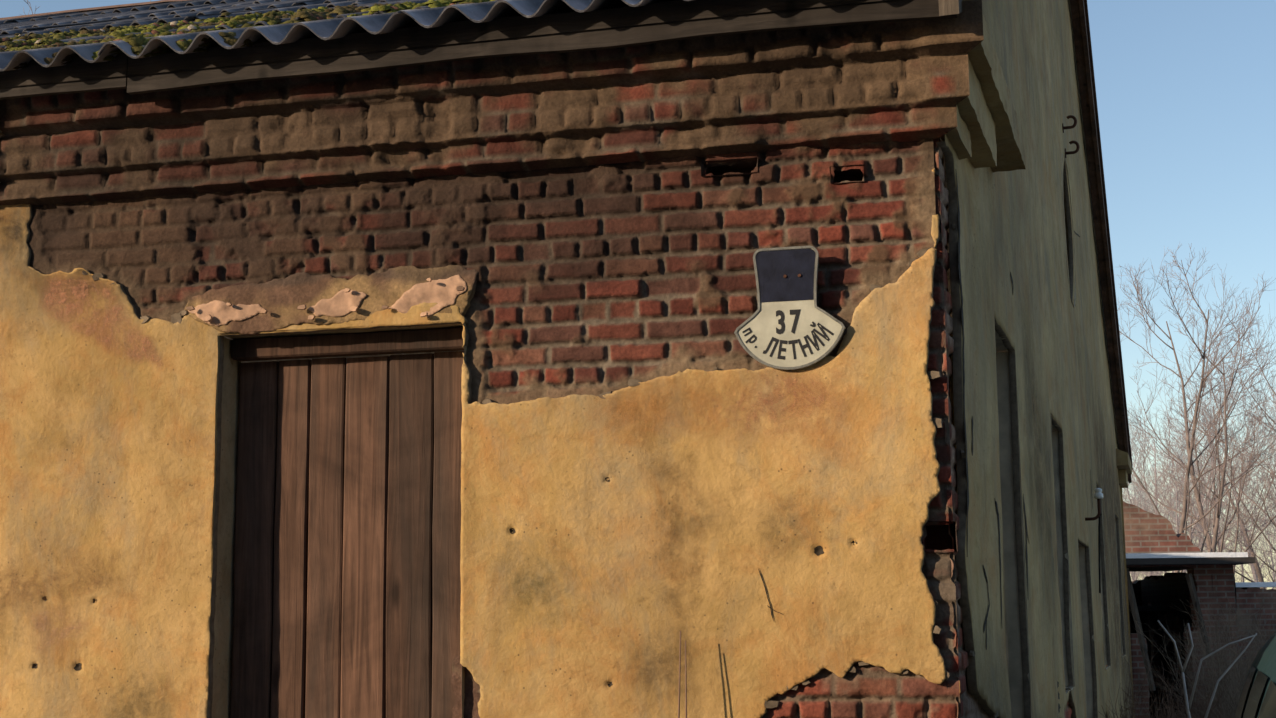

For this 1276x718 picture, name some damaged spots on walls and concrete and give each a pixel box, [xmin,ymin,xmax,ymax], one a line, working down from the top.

flaking render [0,0,998,718]
crack [758,569,782,621]
crack [956,173,1029,650]